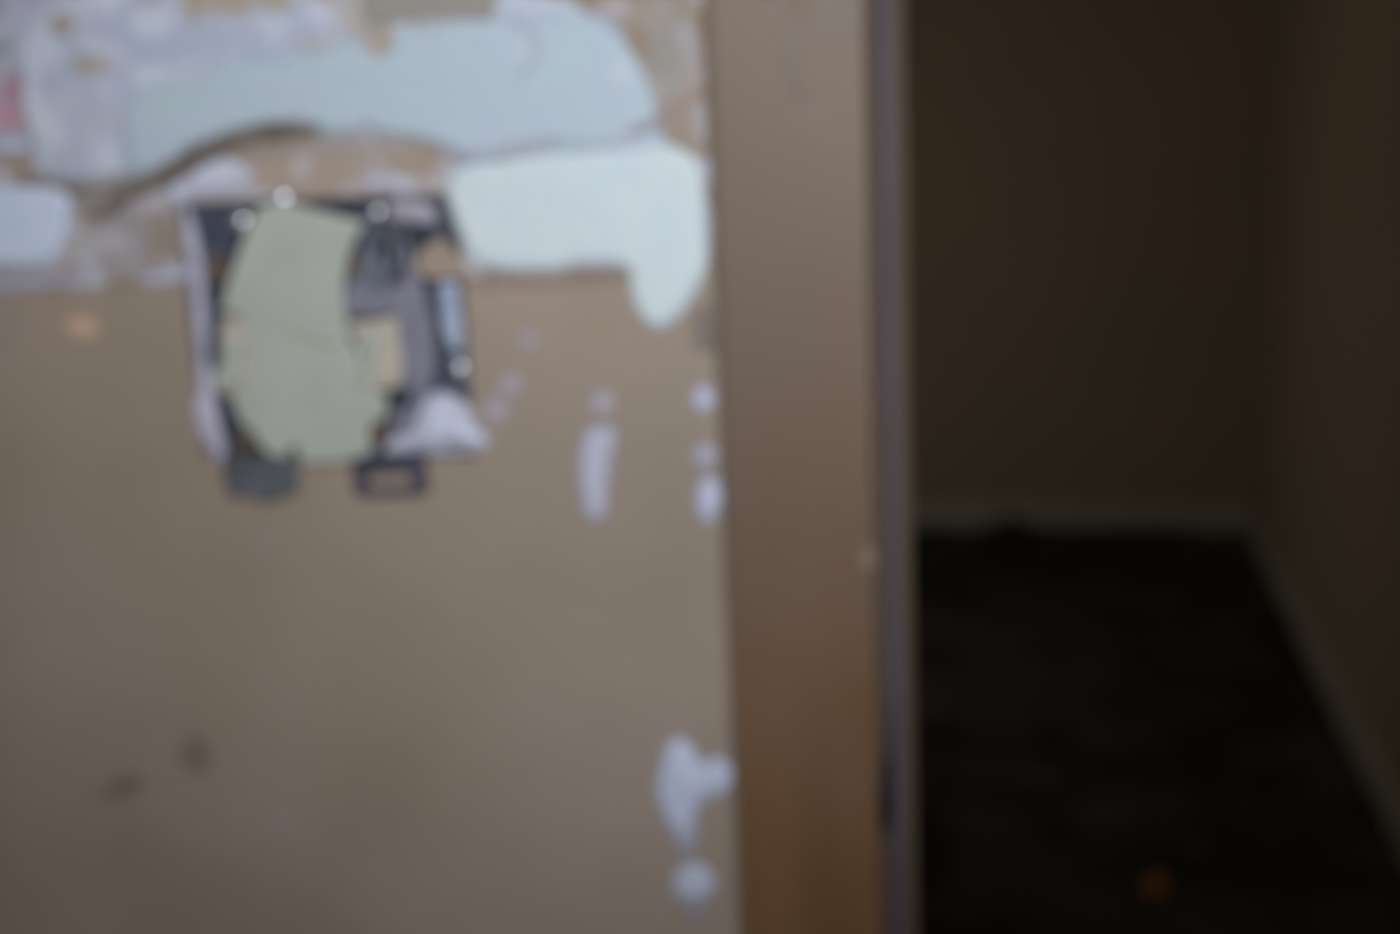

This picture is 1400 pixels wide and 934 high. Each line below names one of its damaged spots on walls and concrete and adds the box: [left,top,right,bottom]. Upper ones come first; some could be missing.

peeling [363,0,492,26]
peeling [0,125,498,291]
peeling [462,242,628,278]
peeling [570,0,714,268]